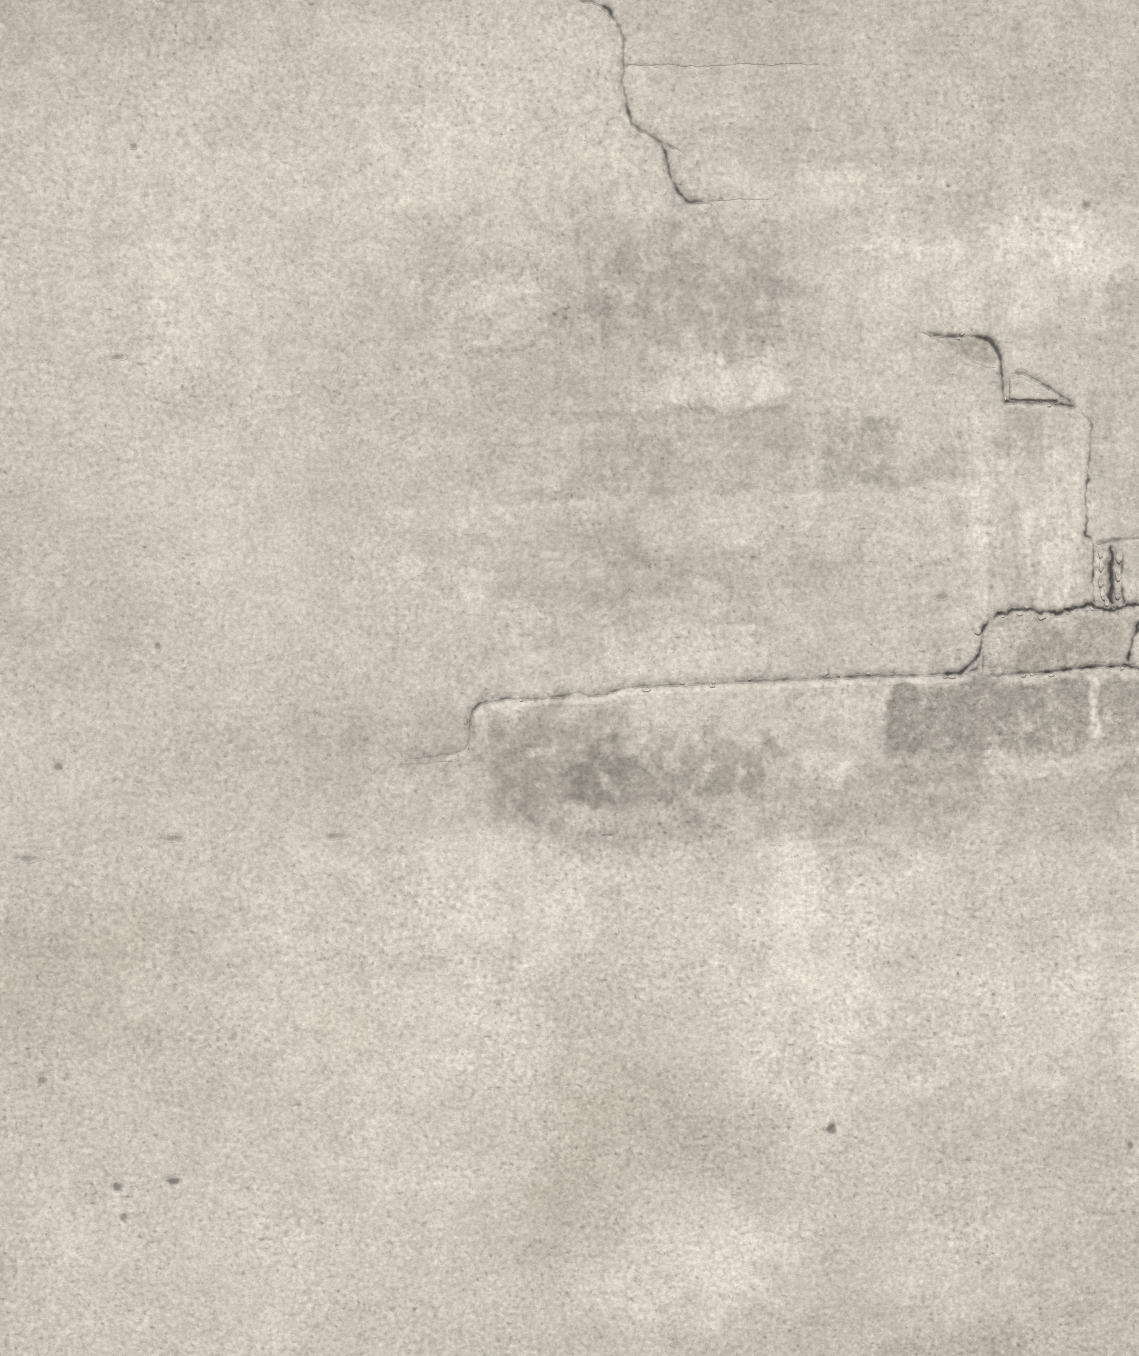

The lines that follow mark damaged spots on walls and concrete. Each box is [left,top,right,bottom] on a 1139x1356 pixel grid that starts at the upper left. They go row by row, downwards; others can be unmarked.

crack [580,0,818,205]
peeling [653,338,794,418]
peeling [630,477,999,570]
leakage [465,680,1139,873]